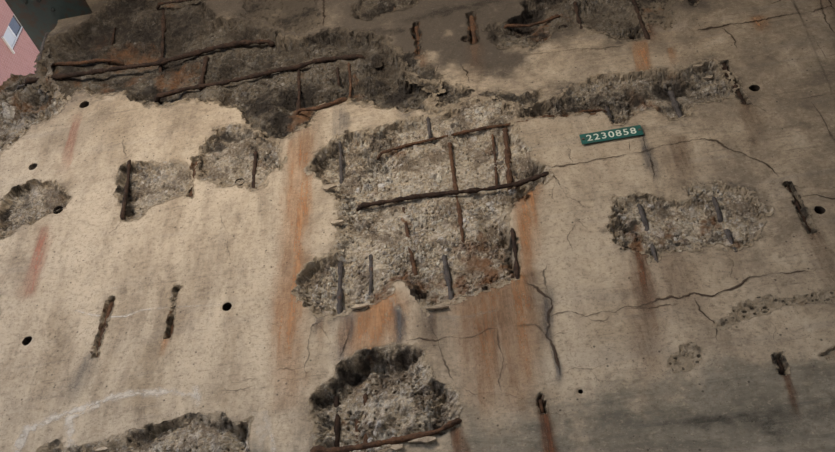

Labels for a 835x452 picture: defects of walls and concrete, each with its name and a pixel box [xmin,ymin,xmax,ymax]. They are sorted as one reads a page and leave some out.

spalling [0,0,774,321]
rust [277,138,309,351]
crack [526,265,627,372]
rust [635,251,648,291]
crack [648,276,761,335]
spalling [36,412,253,452]
spalling [307,342,463,452]
rust [539,412,556,452]